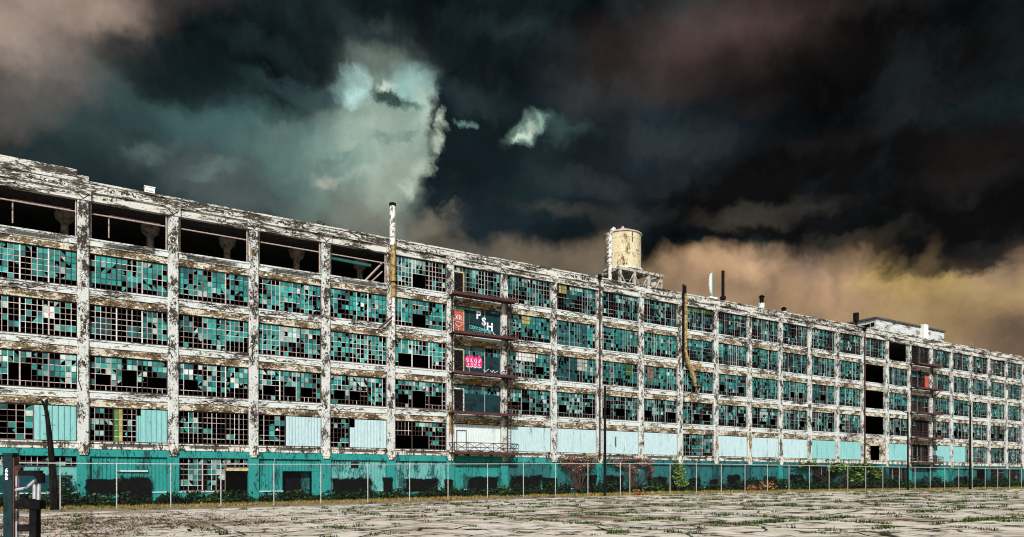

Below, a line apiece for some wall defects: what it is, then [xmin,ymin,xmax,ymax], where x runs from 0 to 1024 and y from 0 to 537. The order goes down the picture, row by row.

peeling [81,225,152,260]
peeling [7,336,58,350]
peeling [101,345,160,359]
peeling [171,331,257,365]
peeling [651,291,831,410]